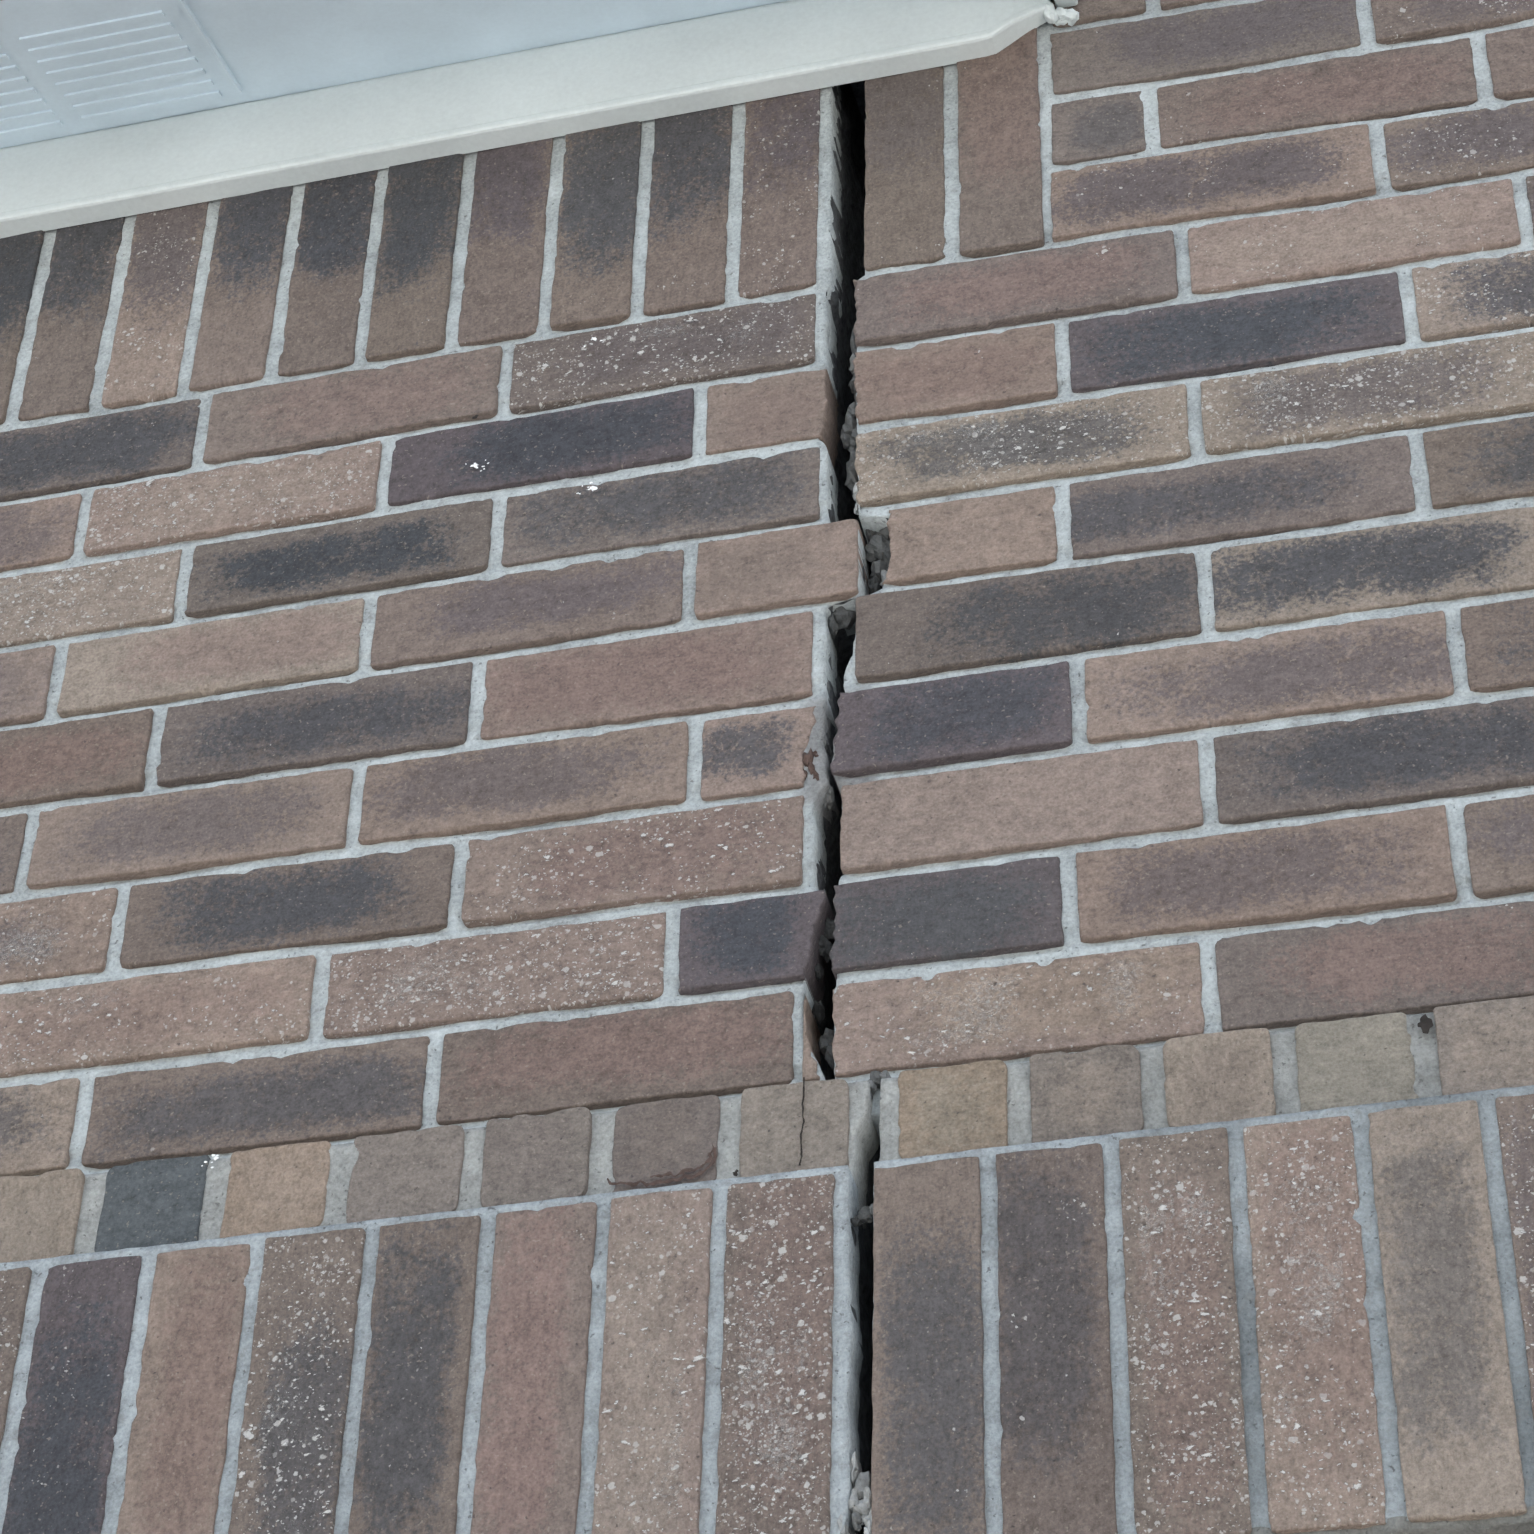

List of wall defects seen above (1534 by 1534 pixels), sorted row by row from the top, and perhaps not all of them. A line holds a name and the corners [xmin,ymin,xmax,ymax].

crack [799,83,891,1166]
crack [837,1145,880,1534]